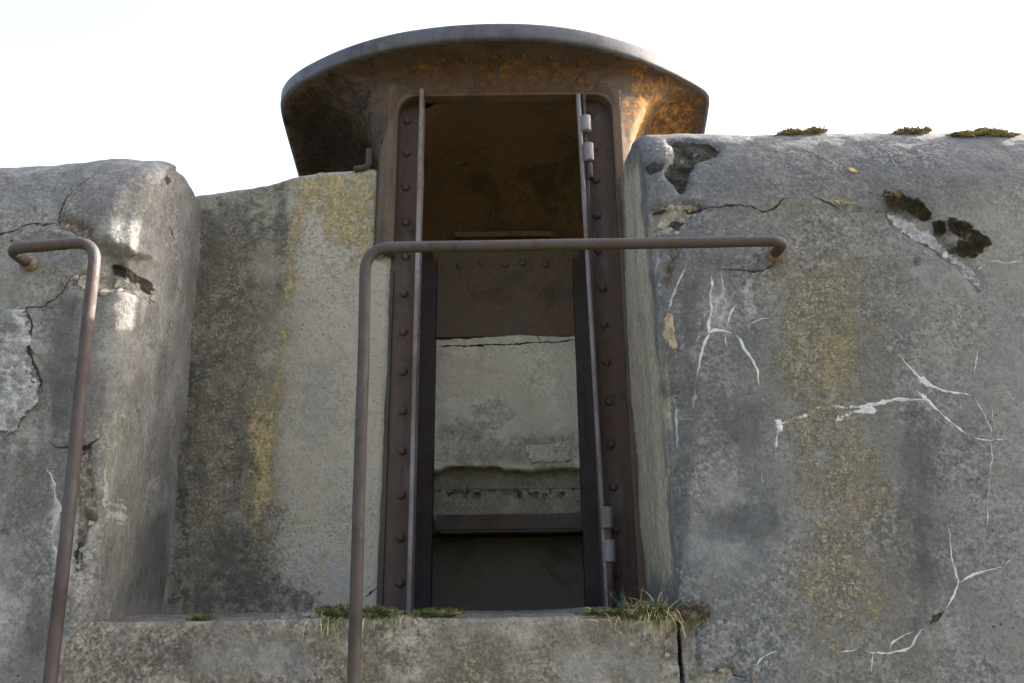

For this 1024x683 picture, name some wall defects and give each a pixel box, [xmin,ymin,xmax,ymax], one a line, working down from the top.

corrosion [284,73,378,176]
corrosion [610,54,700,143]
peeling [0,306,40,436]
crack [26,276,71,393]
spalling [73,264,156,304]
crack [439,337,574,347]
spalling [644,141,719,288]
crack [677,262,776,420]
spalling [886,211,986,290]
leakage [236,382,290,565]
crack [759,351,1002,523]
crack [842,527,1015,672]